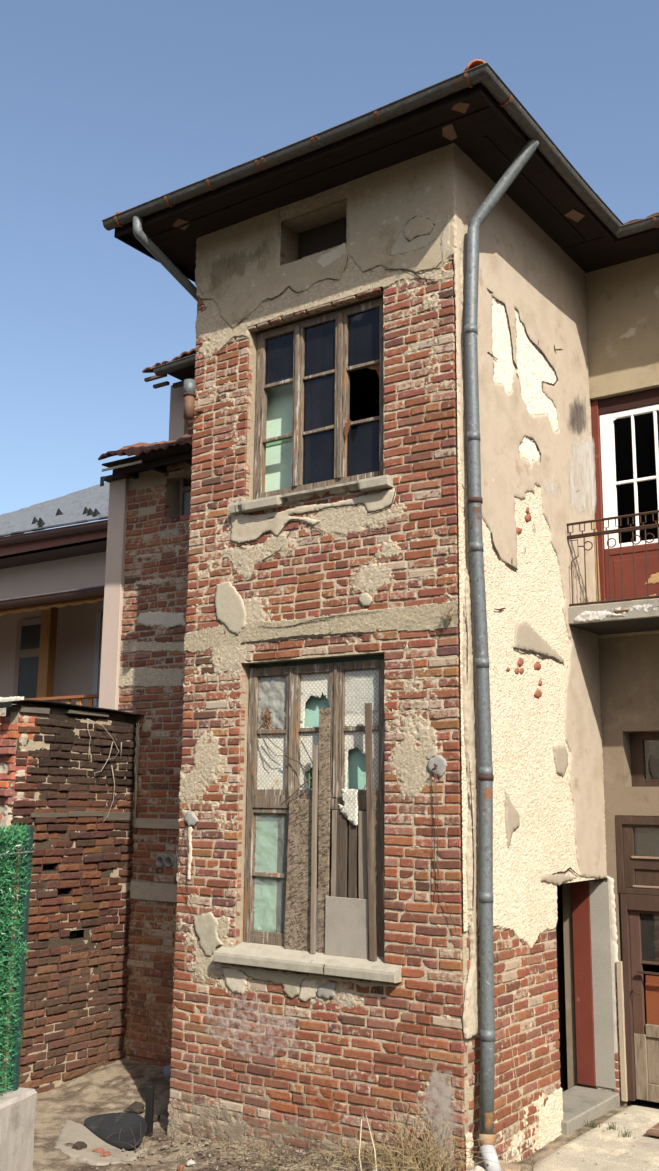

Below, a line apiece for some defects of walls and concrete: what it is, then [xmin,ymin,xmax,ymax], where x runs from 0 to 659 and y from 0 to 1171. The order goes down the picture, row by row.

crack [221,256,442,349]
flaking render [492,298,558,432]
flaking render [519,436,541,466]
flaking render [231,490,396,543]
spalling [574,609,629,622]
flaking render [506,658,542,698]
flaking render [219,963,393,998]